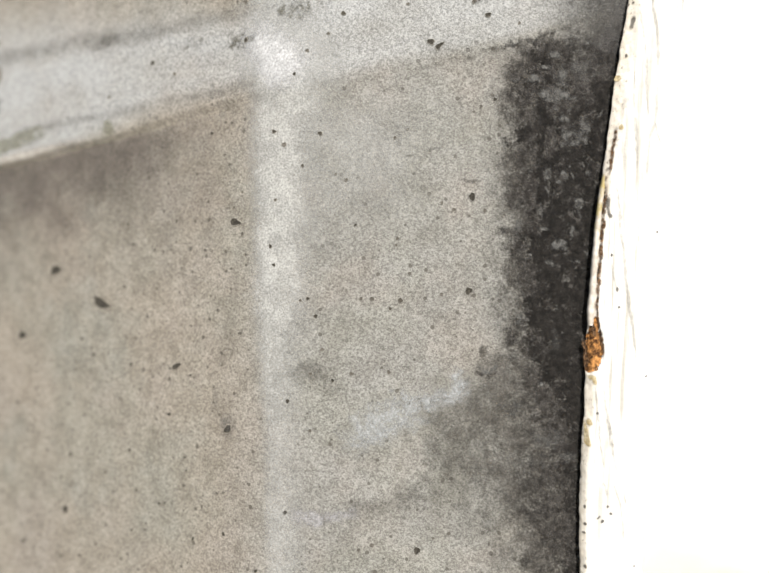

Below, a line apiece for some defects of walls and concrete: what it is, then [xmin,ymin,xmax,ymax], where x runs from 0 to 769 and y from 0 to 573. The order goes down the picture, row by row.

leakage [465,0,629,573]
rust [582,130,617,373]